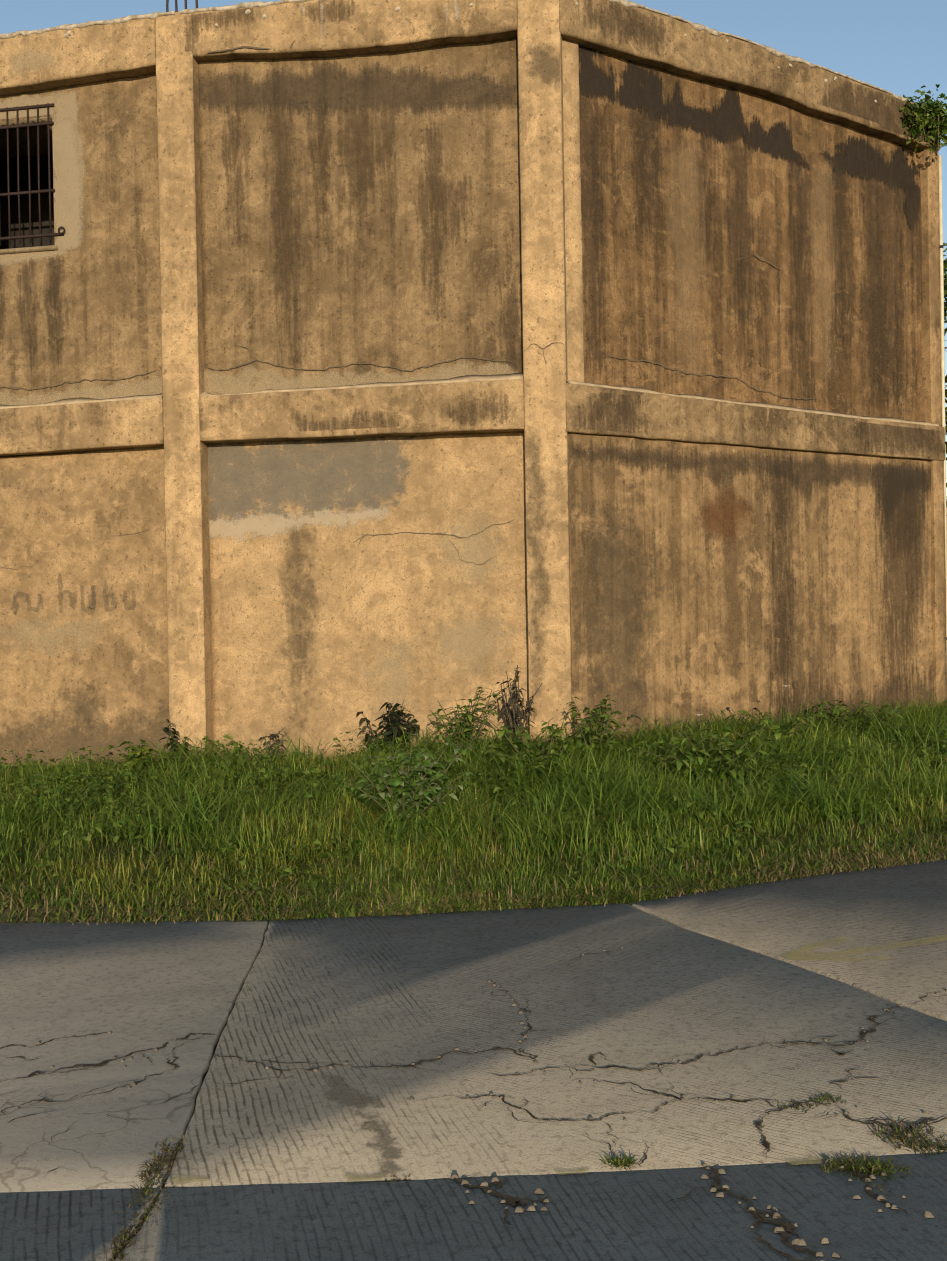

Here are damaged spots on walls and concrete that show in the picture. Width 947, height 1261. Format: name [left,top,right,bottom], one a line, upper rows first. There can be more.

water stain [199,66,512,112]
water stain [578,45,810,170]
water stain [821,135,920,230]
water stain [578,449,931,509]
water stain [209,507,389,541]